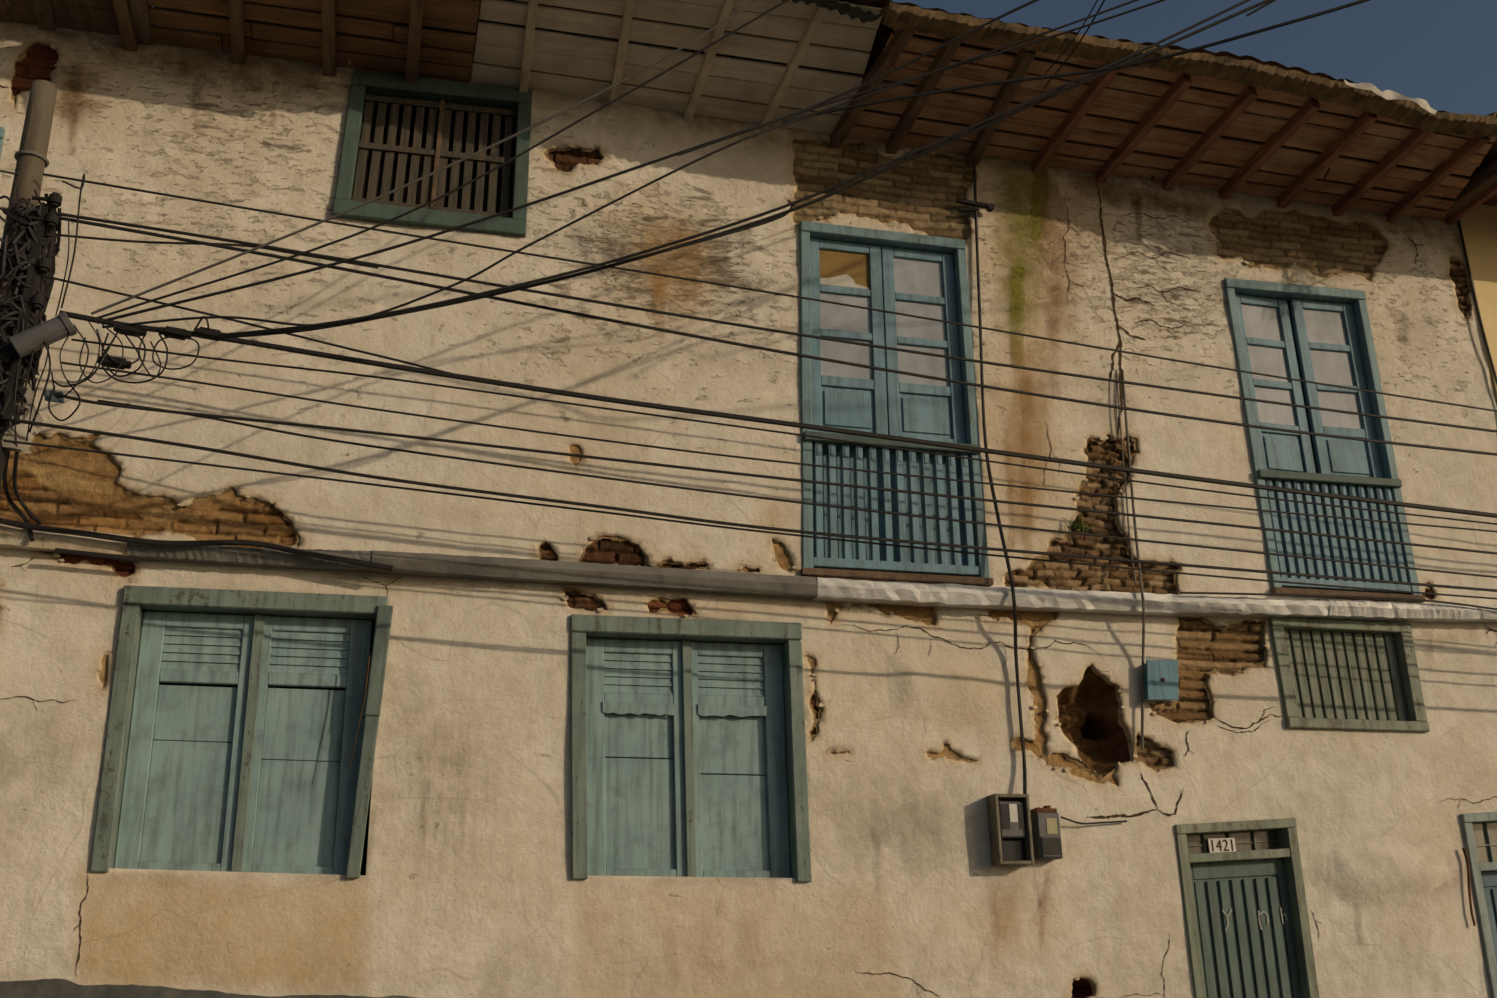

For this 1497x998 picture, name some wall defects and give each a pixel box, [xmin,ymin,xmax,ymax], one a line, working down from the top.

spalling [789,139,977,253]
spalling [1209,208,1387,281]
water stain [1011,267,1024,365]
crack [1052,182,1201,434]
spalling [0,433,301,549]
spalling [579,535,709,570]
spalling [1004,435,1181,595]
crack [0,696,71,710]
crack [851,625,1105,665]
spalling [988,610,1174,786]
spalling [1148,617,1268,724]
crack [1091,707,1281,819]